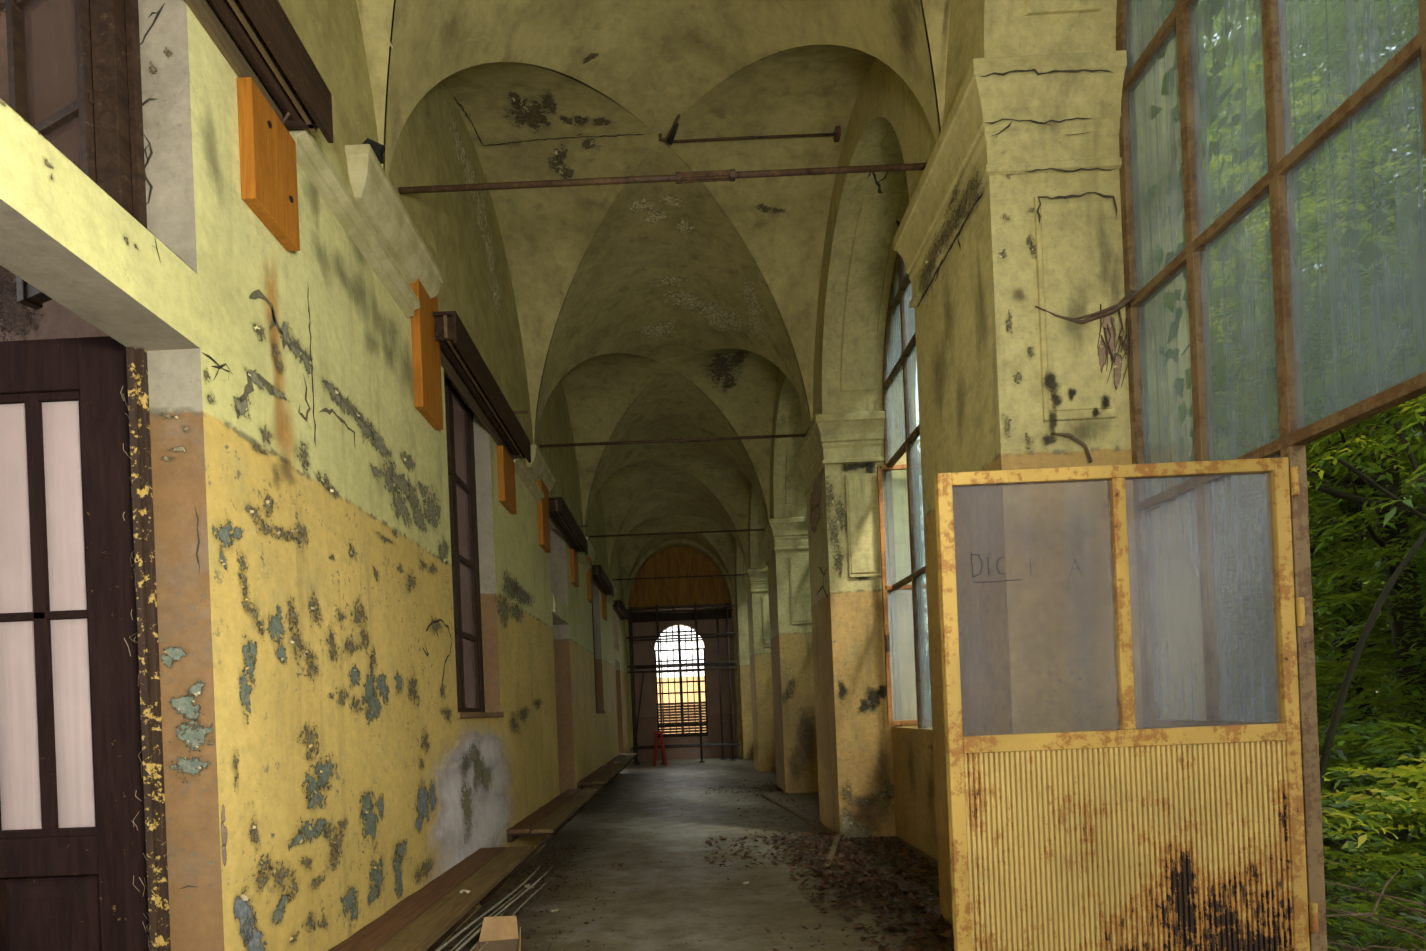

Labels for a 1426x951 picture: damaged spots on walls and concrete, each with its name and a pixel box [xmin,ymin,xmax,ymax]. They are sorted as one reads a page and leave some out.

crack [980,67,1113,77]
peeling [204,322,449,591]
mould [1043,373,1076,445]
mould [1093,395,1109,417]
peeling [161,646,187,669]
peeling [212,493,420,726]
peeling [495,571,535,628]
peeling [166,680,215,783]
peeling [233,723,438,951]
efflorescence [436,733,509,876]
peeling [459,734,494,844]